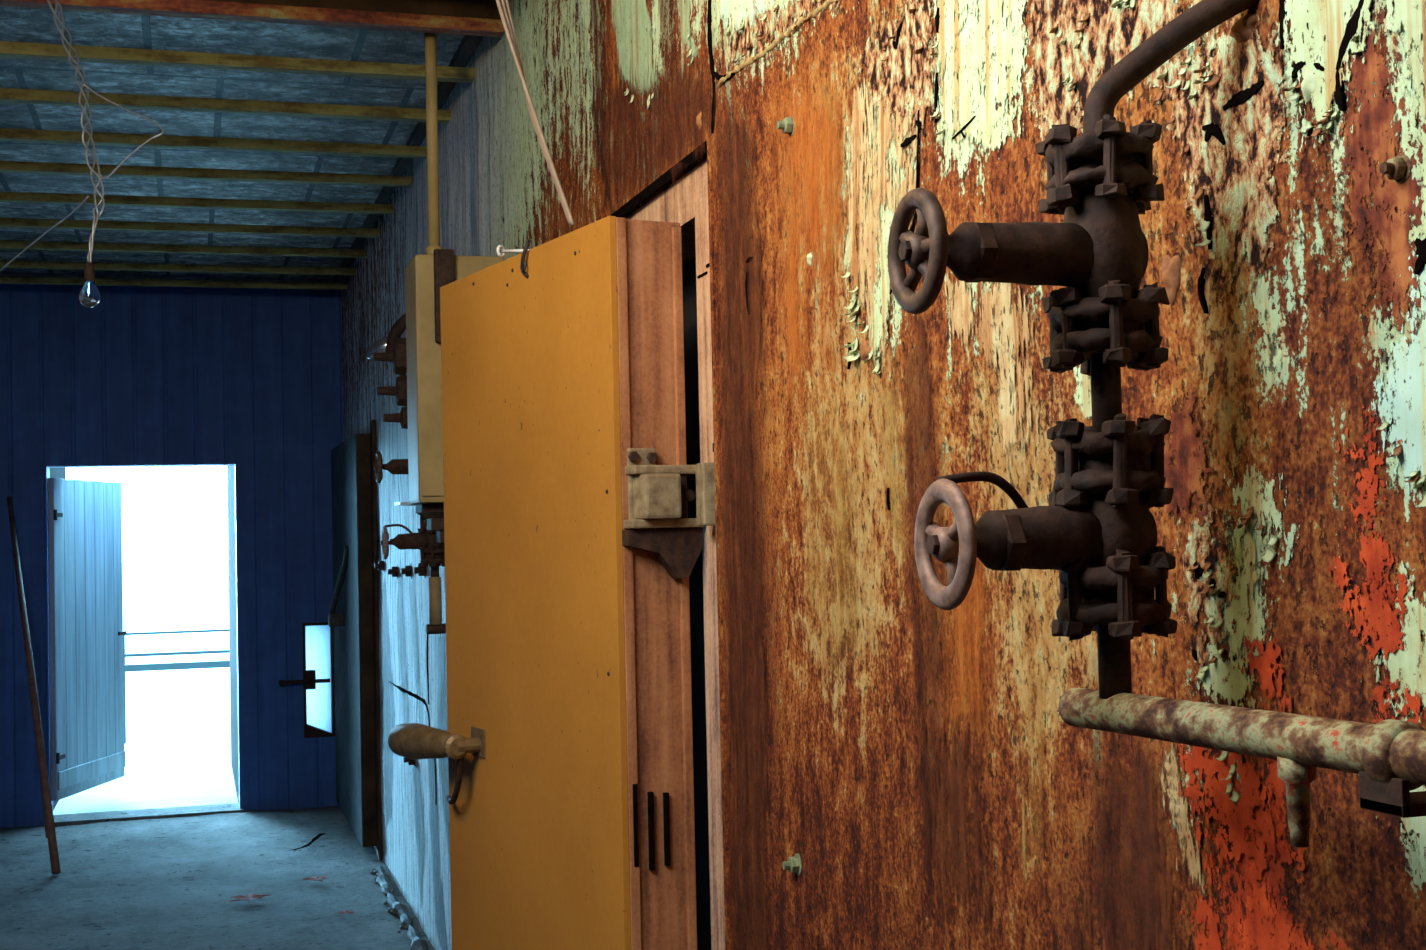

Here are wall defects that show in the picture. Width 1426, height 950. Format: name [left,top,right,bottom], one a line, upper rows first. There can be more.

peeling [611,0,656,110]
corrosion [590,0,713,199]
peeling [841,0,1028,376]
corrosion [1162,255,1181,305]
corrosion [1301,68,1322,103]
peeling [1269,0,1426,508]
corrosion [1328,7,1426,366]
corrosion [1151,389,1217,532]
corrosion [885,313,981,864]
peeling [1187,464,1300,709]
peeling [1370,561,1426,717]
peeling [1159,744,1205,896]